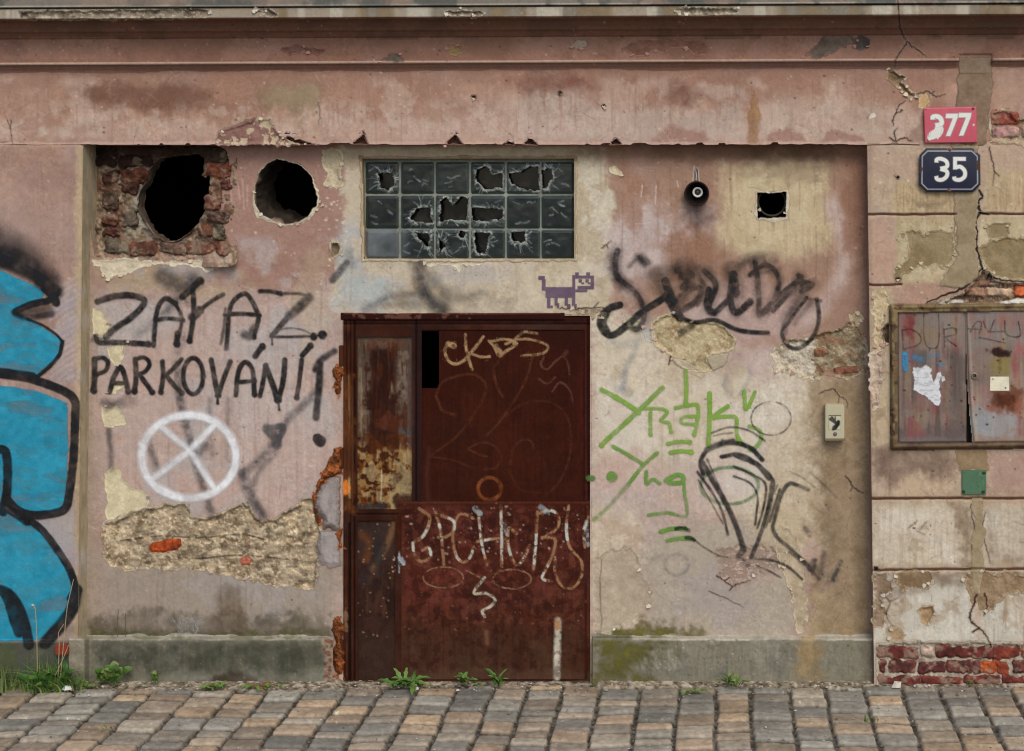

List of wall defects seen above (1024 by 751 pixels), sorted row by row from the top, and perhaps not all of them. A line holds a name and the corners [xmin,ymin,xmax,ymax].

peeling [801,34,870,59]
crack [894,0,926,67]
spalling [886,67,930,109]
crack [889,90,946,142]
flaking render [92,116,368,281]
spalling [923,223,1024,305]
crack [925,147,1024,304]
spalling [570,307,737,373]
spalling [770,230,958,411]
spalling [101,467,322,591]
flaking render [871,566,1024,685]
crack [969,593,993,660]